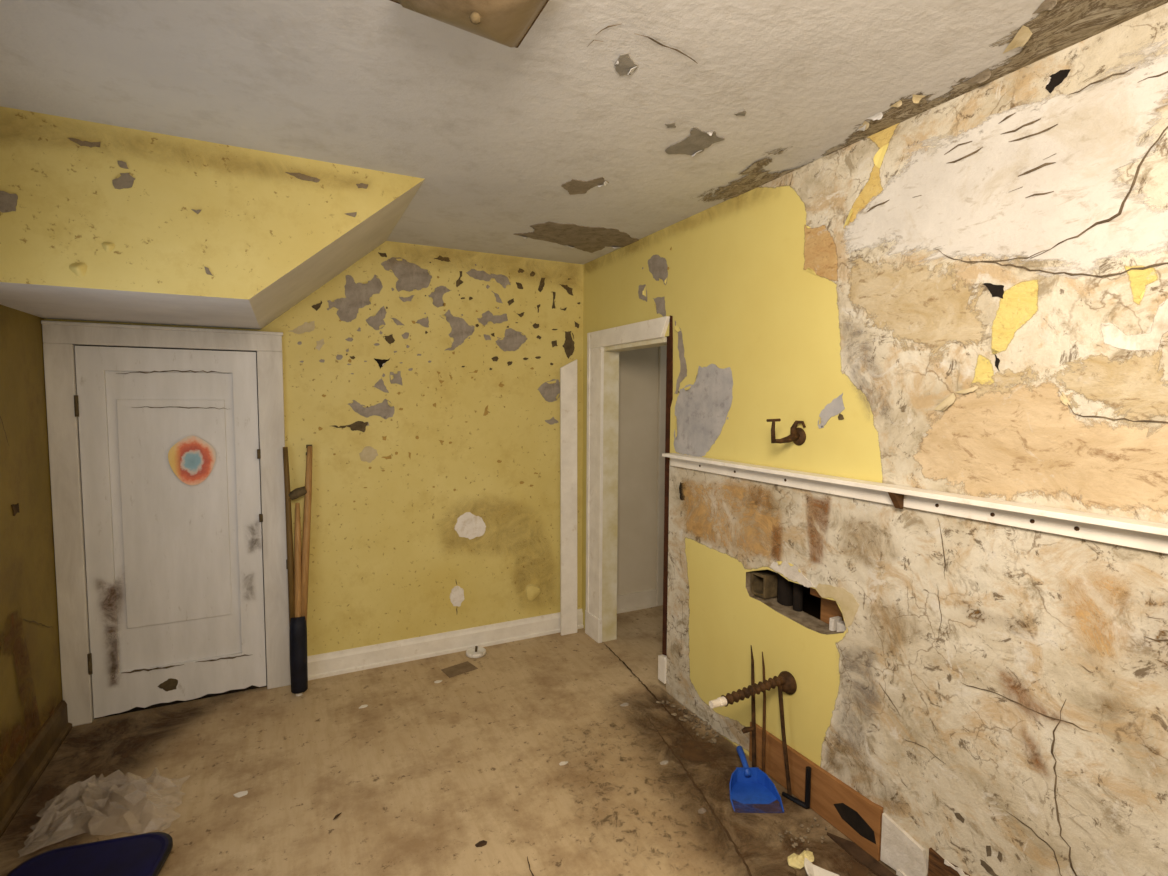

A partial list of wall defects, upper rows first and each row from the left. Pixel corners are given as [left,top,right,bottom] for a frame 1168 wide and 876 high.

peeling [614,52,638,76]
crack [1071,67,1168,94]
peeling [665,122,725,157]
peeling [0,191,18,213]
peeling [112,161,135,189]
peeling [561,177,609,195]
crack [933,126,1168,277]
peeling [513,222,639,253]
peeling [700,0,1168,524]
peeling [288,252,580,432]
peeling [638,247,1168,876]
crack [964,684,1091,876]